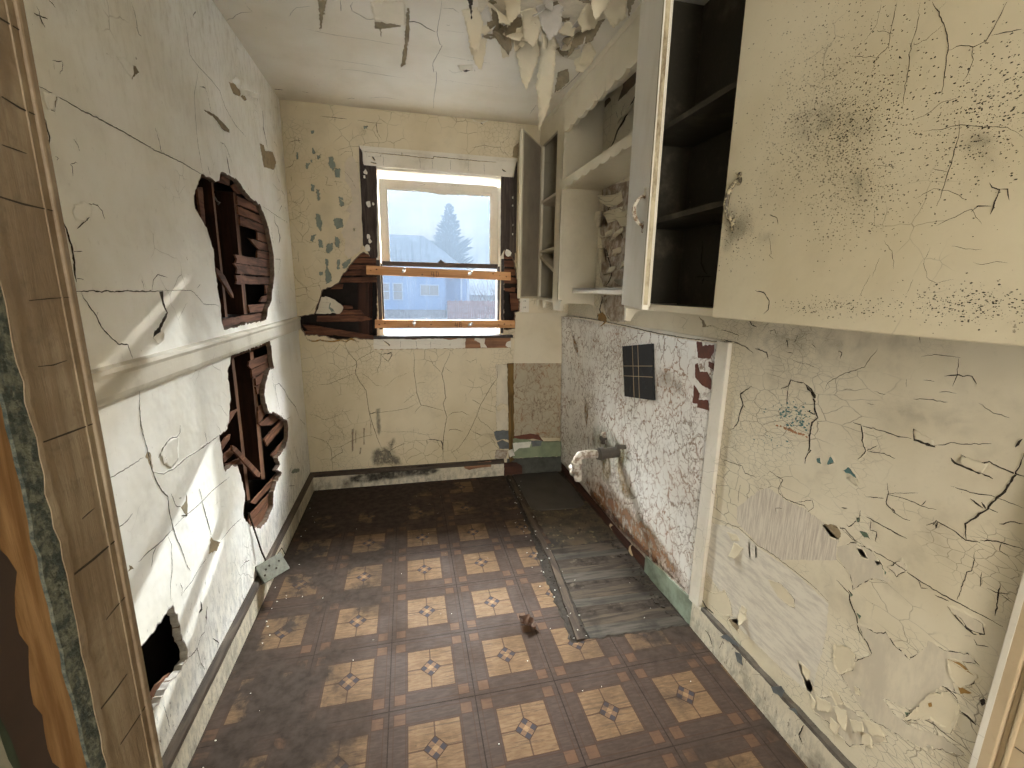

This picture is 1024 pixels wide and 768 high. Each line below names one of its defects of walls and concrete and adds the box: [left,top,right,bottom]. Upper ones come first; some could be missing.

peeling [458,0,636,131]
mould [719,0,1024,272]
crack [855,2,1021,225]
crack [0,196,218,358]
hole [194,172,274,330]
crack [567,207,876,463]
mould [775,272,1024,334]
spalling [219,341,300,529]
leakage [351,441,437,482]
crack [836,337,1024,647]
hole [141,605,188,709]
peeling [703,488,979,760]